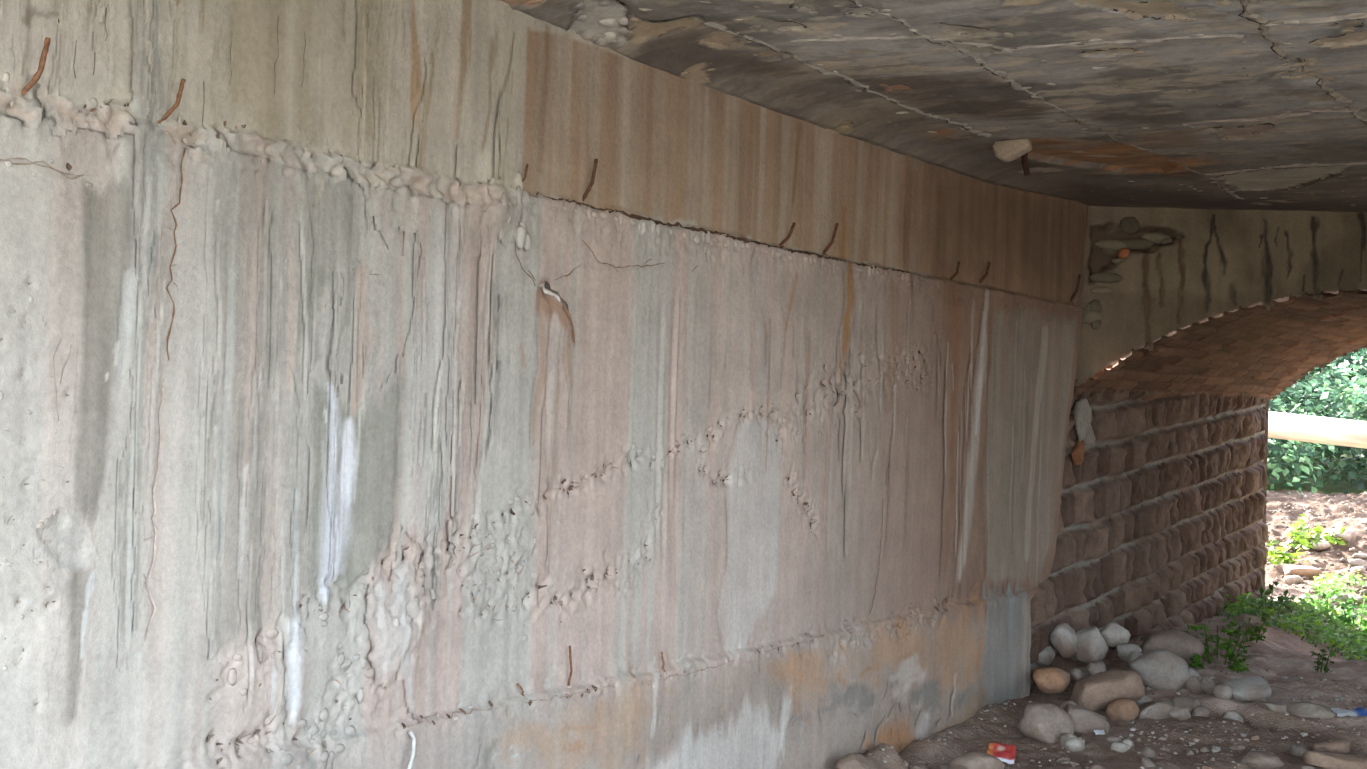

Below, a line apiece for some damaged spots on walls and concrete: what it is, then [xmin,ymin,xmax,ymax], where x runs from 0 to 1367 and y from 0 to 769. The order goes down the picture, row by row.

peeling [566,0,823,85]
peeling [1281,7,1367,49]
crack [0,158,80,176]
corrosion [521,21,1229,376]
flaking render [992,139,1066,176]
peeling [1205,163,1359,203]
leakage [1278,140,1367,164]
crack [511,217,697,285]
crack [130,34,233,641]
leakage [0,0,574,769]
leakage [678,157,1367,738]
leakage [637,652,878,769]